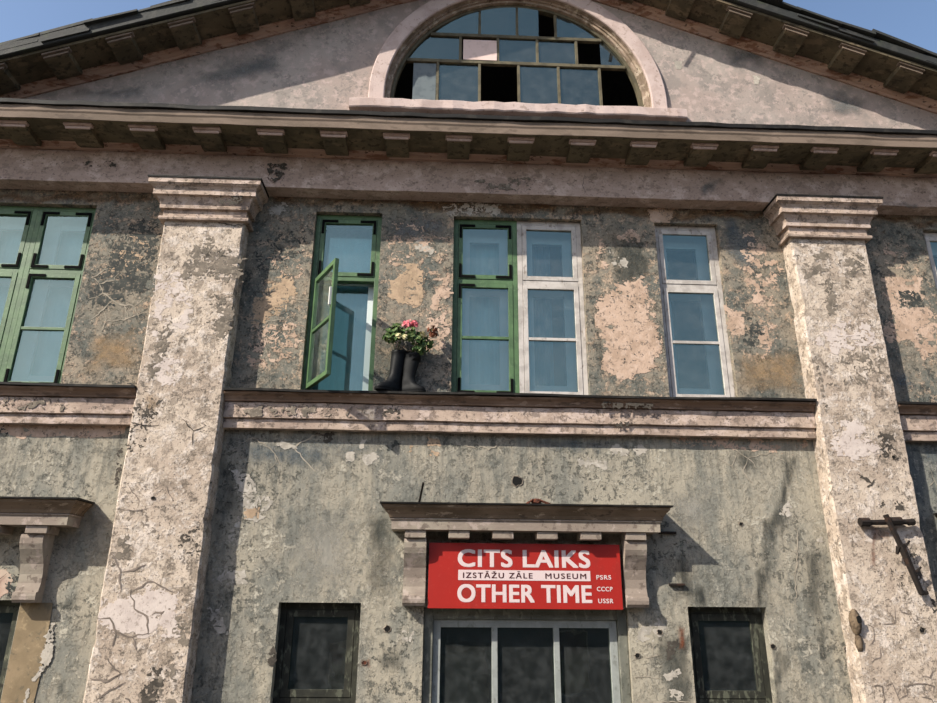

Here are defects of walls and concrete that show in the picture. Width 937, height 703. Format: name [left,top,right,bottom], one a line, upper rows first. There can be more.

peeling [0,217,307,491]
peeling [386,223,454,357]
peeling [594,233,663,382]
peeling [617,229,641,242]
peeling [801,243,937,412]
spalling [23,623,55,703]
crack [90,552,173,703]